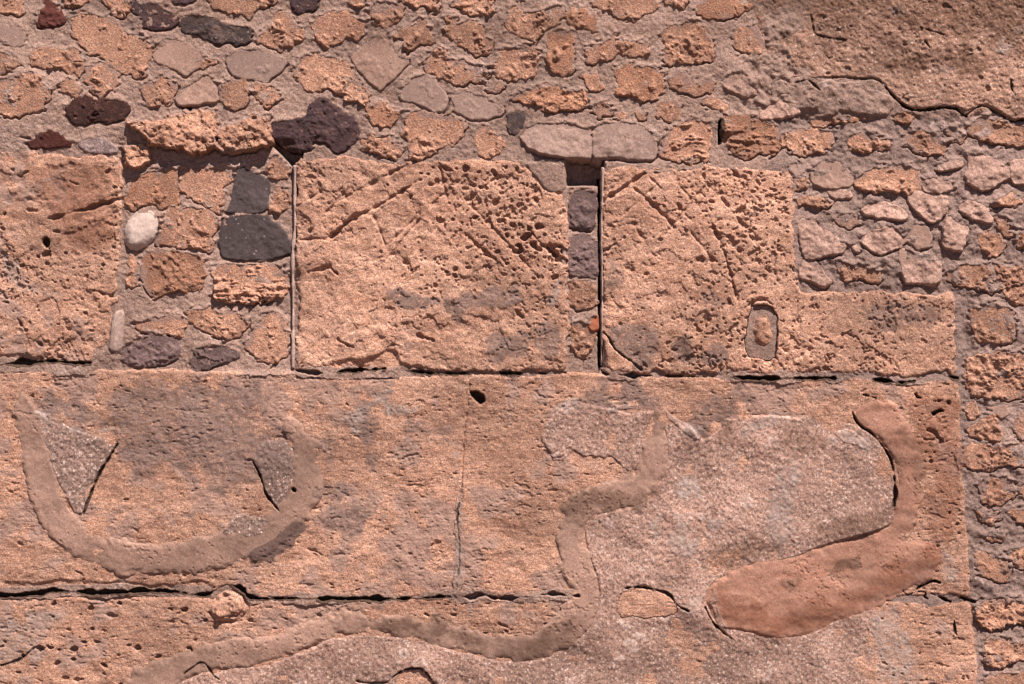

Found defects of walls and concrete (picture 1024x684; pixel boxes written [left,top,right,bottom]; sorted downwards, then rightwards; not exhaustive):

crack [885,87,968,118]
crack [1008,79,1024,122]